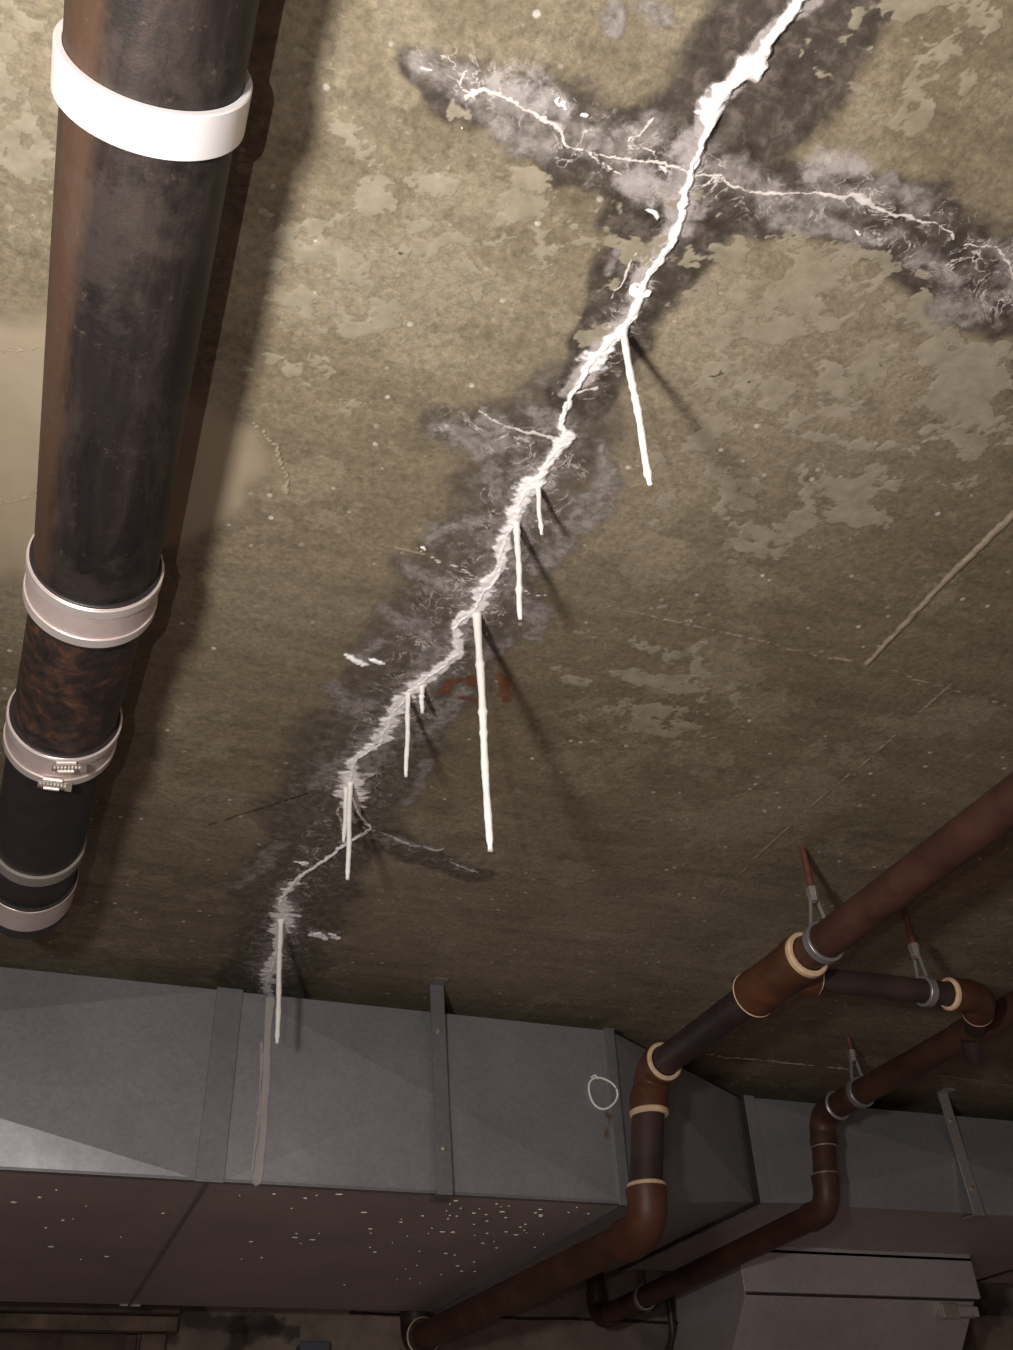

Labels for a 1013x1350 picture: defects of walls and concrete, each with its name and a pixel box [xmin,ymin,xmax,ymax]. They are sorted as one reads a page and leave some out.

corrosion [439,675,479,704]
crack [209,0,1013,995]
damp [219,0,1013,1185]